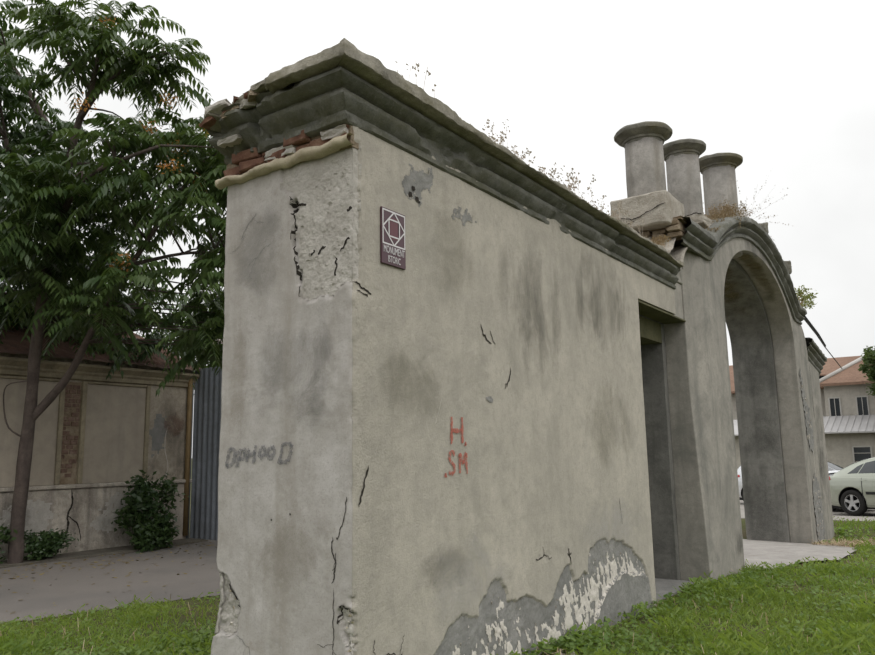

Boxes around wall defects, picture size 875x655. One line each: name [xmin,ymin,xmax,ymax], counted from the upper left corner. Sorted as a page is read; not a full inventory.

spalling [199,79,270,132]
peeling [402,163,434,207]
flaking render [223,124,362,300]
flaking render [640,219,686,245]
crack [317,466,369,655]
flaking render [214,573,240,636]
flaking render [337,606,357,655]